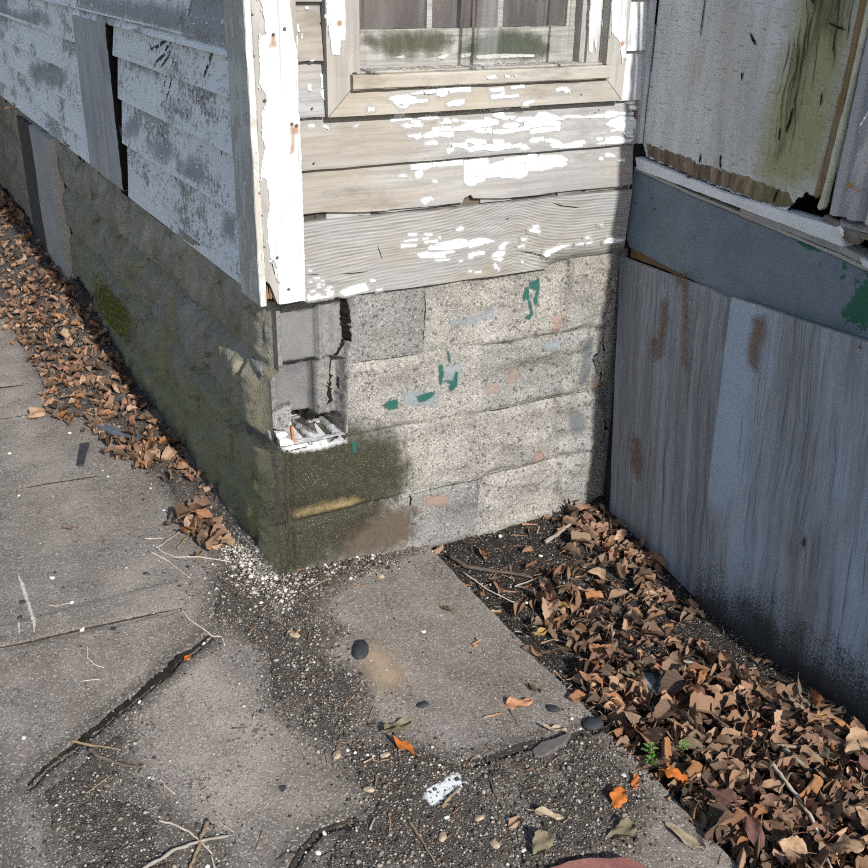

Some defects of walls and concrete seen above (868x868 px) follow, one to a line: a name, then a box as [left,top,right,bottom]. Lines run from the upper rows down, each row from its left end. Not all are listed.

peeling [387,75,637,187]
peeling [420,196,435,207]
peeling [400,224,541,274]
peeling [542,235,592,258]
crack [327,297,426,405]
crack [468,341,606,415]
rust [750,319,764,368]
spalling [272,401,295,446]
water stain [265,409,414,575]
crack [27,635,210,786]